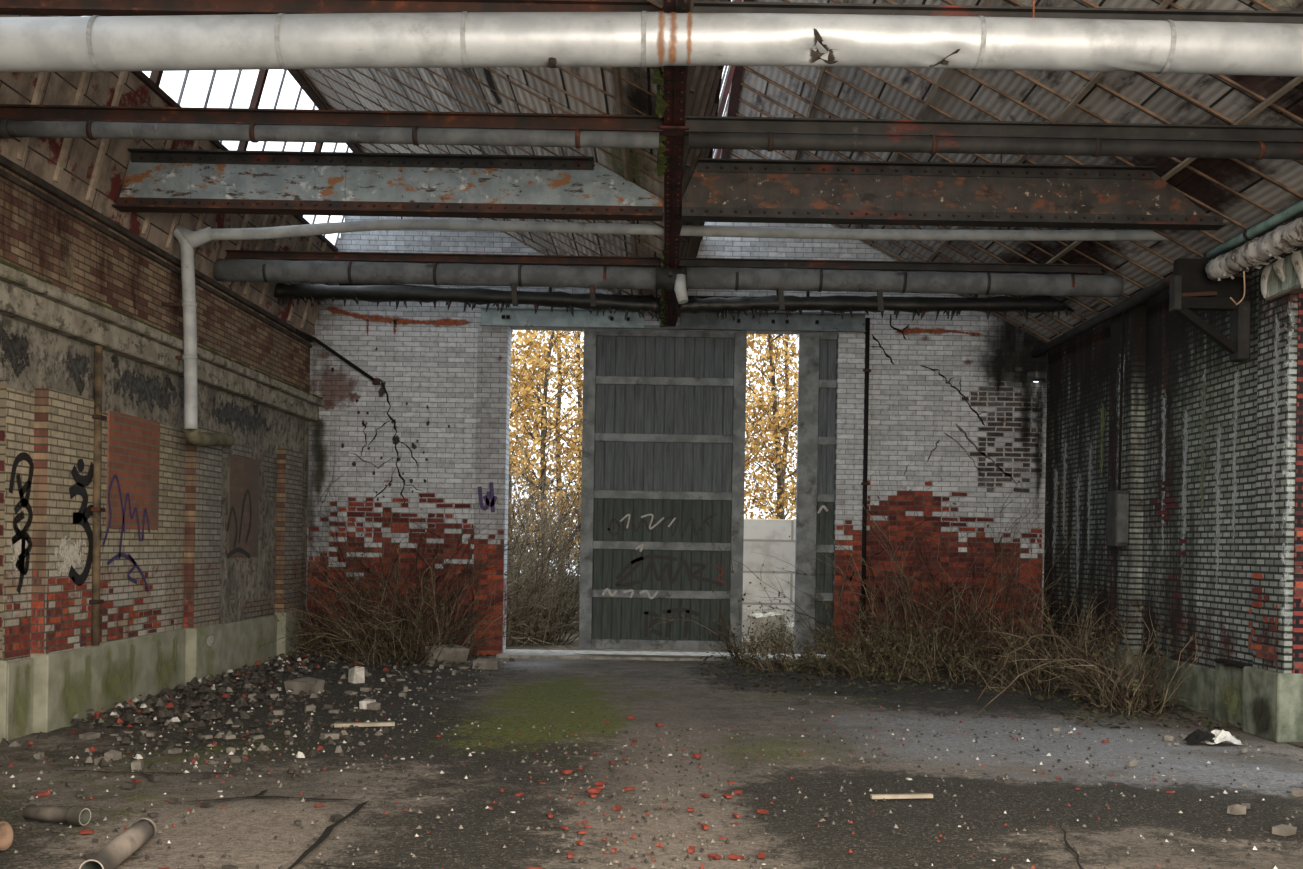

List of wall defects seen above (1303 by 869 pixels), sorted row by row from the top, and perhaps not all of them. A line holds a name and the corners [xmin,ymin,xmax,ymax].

crack [347,379,422,504]
peeling [306,380,504,656]
peeling [834,367,1044,664]
peeling [0,524,194,659]
crack [65,770,392,869]
crack [1059,825,1083,869]